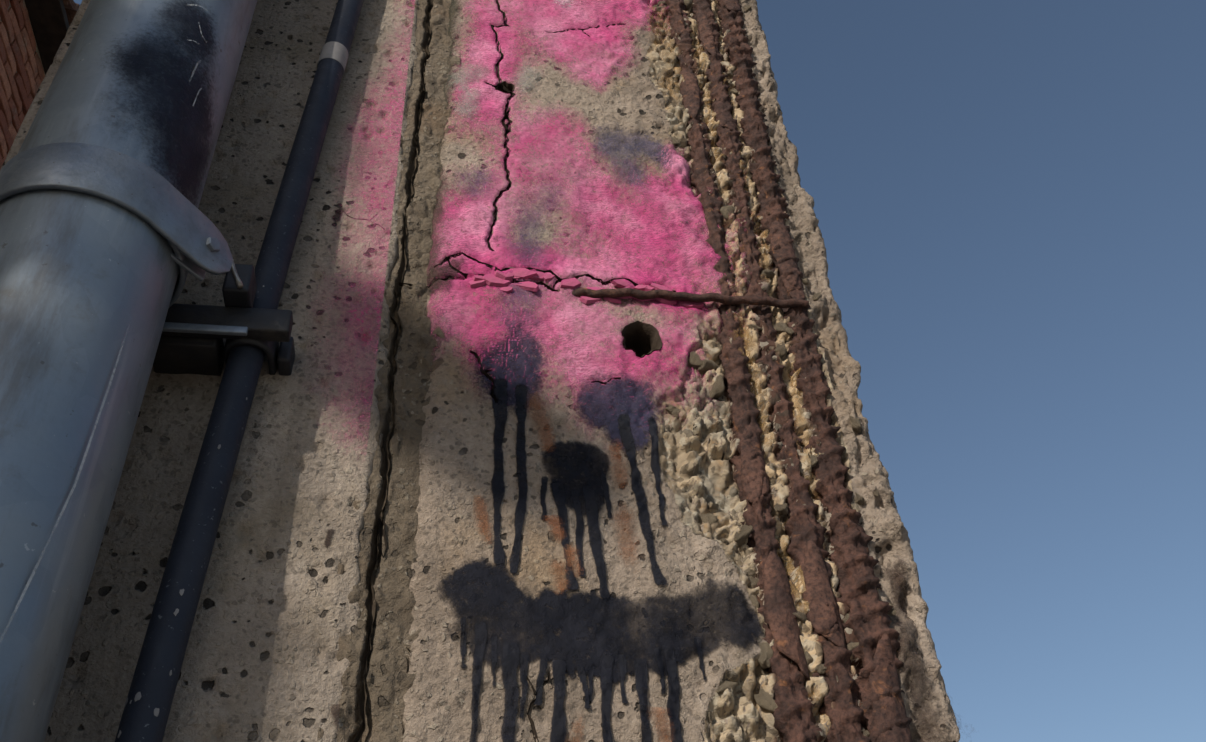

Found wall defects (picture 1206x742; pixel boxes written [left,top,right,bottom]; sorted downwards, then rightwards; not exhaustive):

crack [342,0,704,742]
spalling [643,0,879,742]
corrosion [763,539,848,681]
corrosion [869,633,913,742]